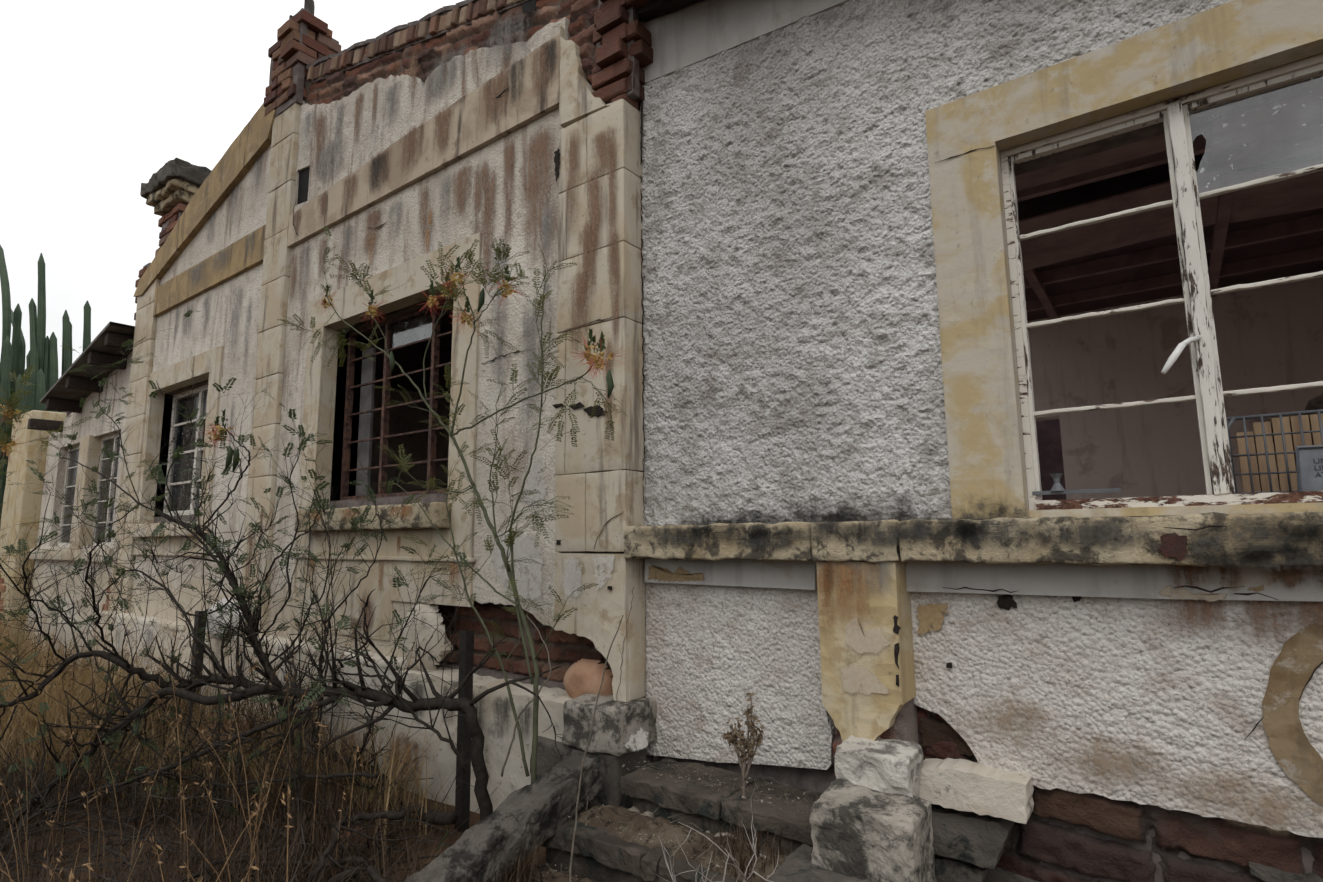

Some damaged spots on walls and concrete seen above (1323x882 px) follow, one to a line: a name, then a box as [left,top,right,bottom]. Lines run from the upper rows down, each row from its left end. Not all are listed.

leakage [485,18,556,116]
leakage [305,84,451,216]
leakage [443,130,616,356]
spalling [436,532,615,682]
flaking render [521,456,547,514]
leakage [636,503,1144,549]
peeling [917,603,951,635]
crack [1165,524,1226,532]
leakage [1172,512,1323,638]
crack [1299,661,1323,700]